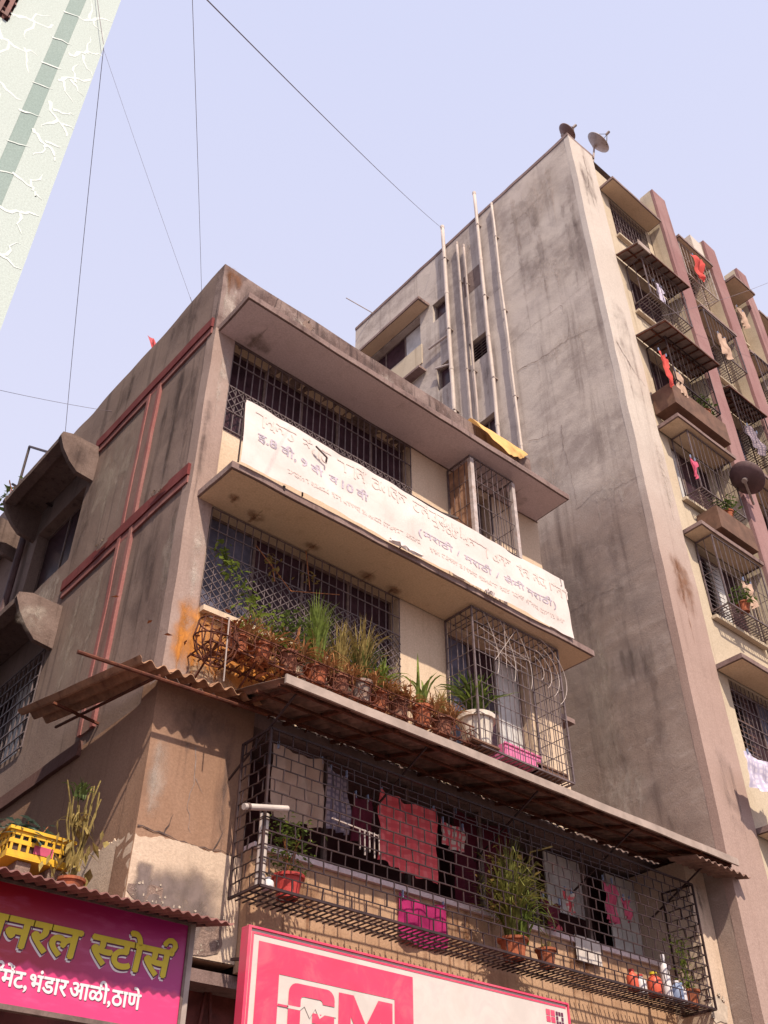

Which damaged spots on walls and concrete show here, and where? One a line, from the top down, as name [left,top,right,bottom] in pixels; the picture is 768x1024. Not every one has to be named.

crack [0,2,113,269]
rust [175,608,283,688]
crack [138,747,240,858]